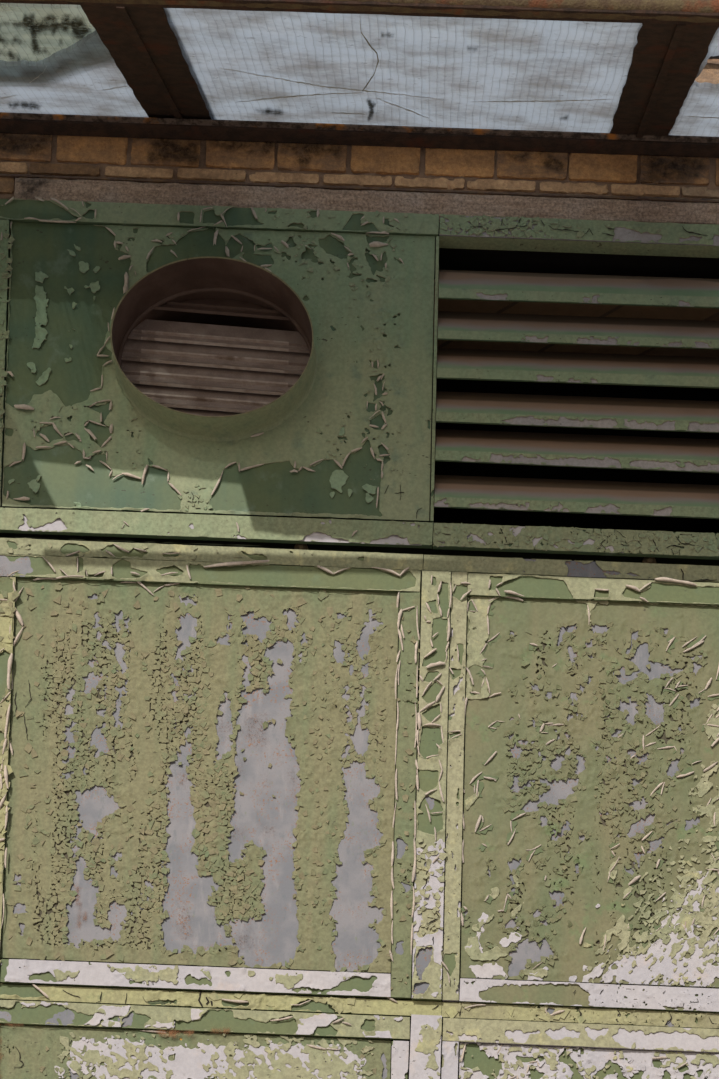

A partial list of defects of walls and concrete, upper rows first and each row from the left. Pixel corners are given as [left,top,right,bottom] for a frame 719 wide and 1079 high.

peeling [0,196,421,546]
peeling [605,223,662,243]
peeling [0,352,719,1079]